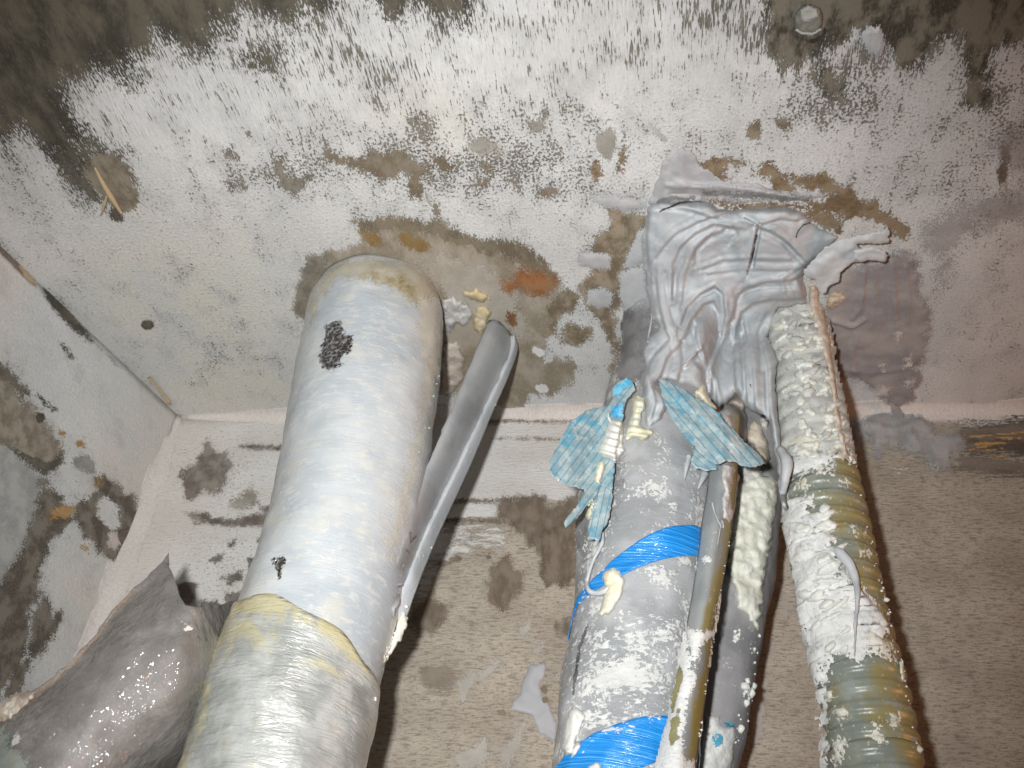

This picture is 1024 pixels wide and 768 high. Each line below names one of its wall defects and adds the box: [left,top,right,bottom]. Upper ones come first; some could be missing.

mould [365,0,492,38]
water stain [757,0,1024,115]
water stain [0,0,347,222]
water stain [271,140,459,222]
water stain [475,157,494,191]
water stain [535,182,561,201]
water stain [587,142,630,184]
water stain [697,154,911,241]
corrosion [501,265,560,298]
water stain [177,437,261,514]
water stain [0,475,71,702]